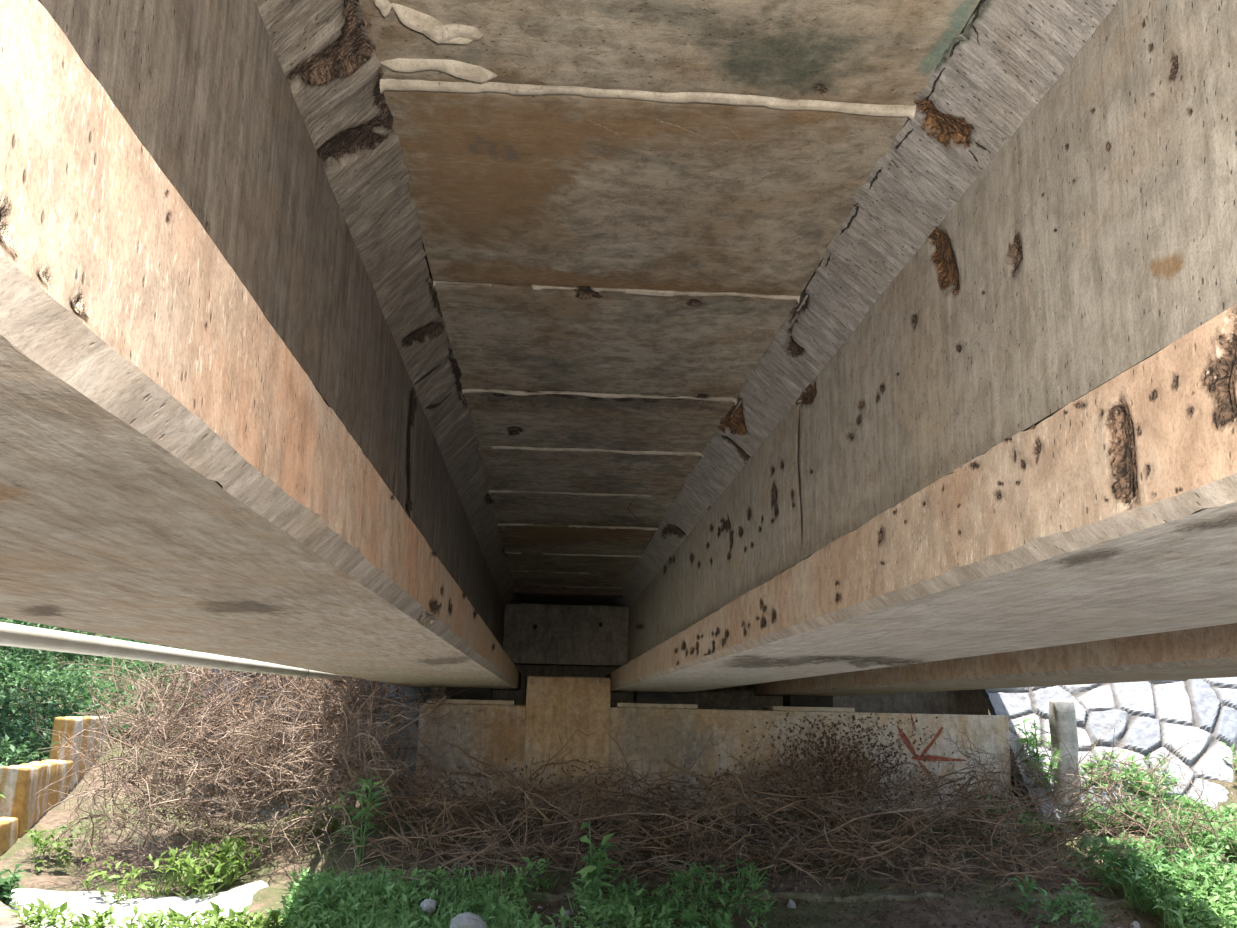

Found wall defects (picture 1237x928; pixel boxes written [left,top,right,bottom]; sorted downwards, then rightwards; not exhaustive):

spalling [287,0,376,87]
crack [926,0,985,100]
spalling [317,73,394,164]
spalling [915,99,987,162]
crack [825,129,913,267]
spalling [928,227,960,295]
spalling [1007,233,1023,277]
spalling [402,280,444,347]
spalling [448,347,472,411]
spalling [482,390,708,411]
spalling [718,397,750,464]